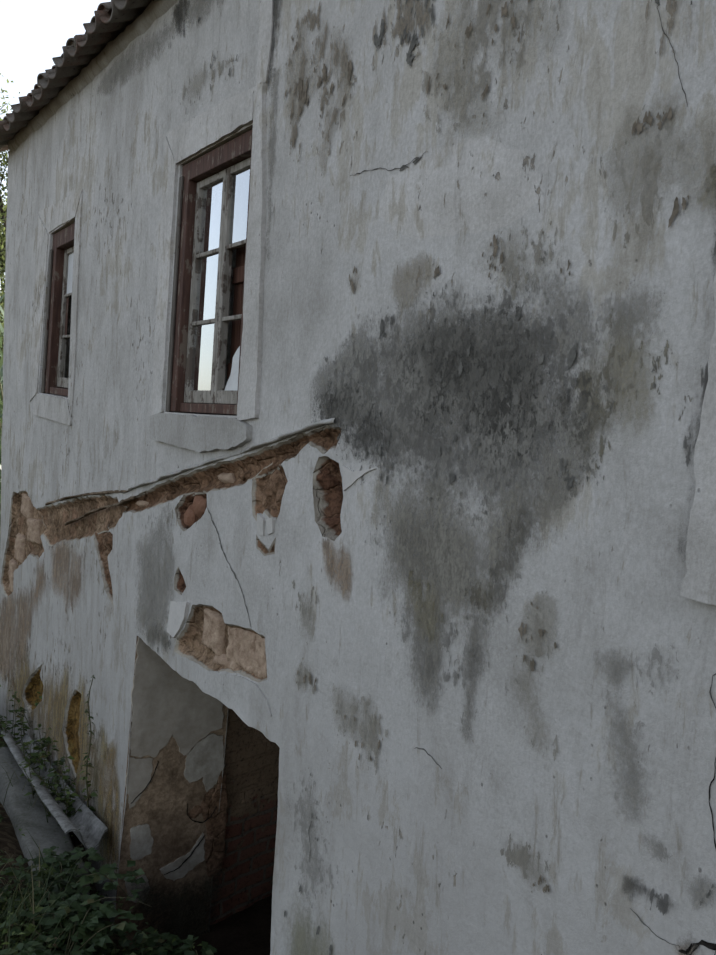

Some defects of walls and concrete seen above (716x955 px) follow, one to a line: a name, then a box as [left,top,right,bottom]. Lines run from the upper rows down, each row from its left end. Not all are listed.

crack [655,0,687,102]
water stain [701,358,709,400]
spalling [0,425,375,604]
water stain [311,255,677,728]
water stain [683,427,696,466]
spalling [22,664,44,712]
spalling [63,689,81,777]
spalling [167,567,272,716]
peeling [296,662,317,693]
spalling [139,737,227,877]
crack [708,758,716,848]
crack [630,908,716,955]